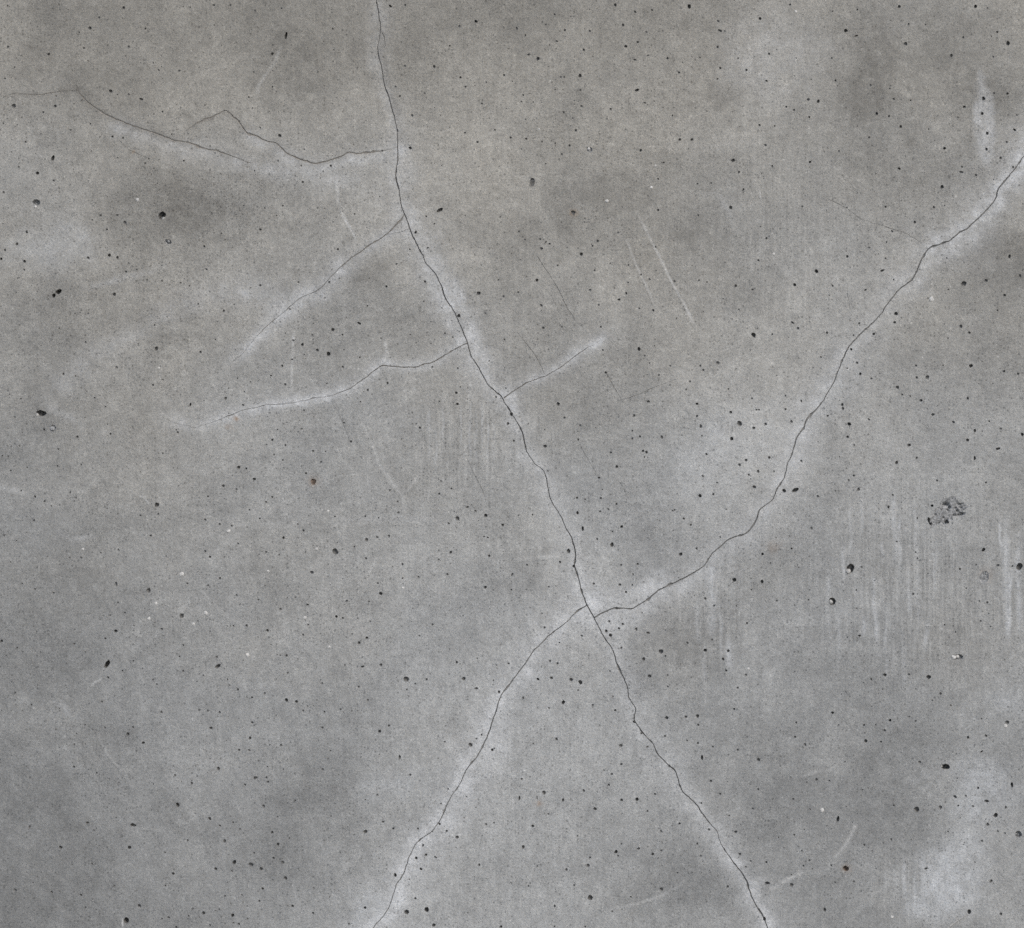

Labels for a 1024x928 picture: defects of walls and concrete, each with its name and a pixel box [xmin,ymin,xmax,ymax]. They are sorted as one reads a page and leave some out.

crack [73,87,251,163]
crack [186,110,389,164]
crack [207,397,317,424]
crack [237,0,1024,928]